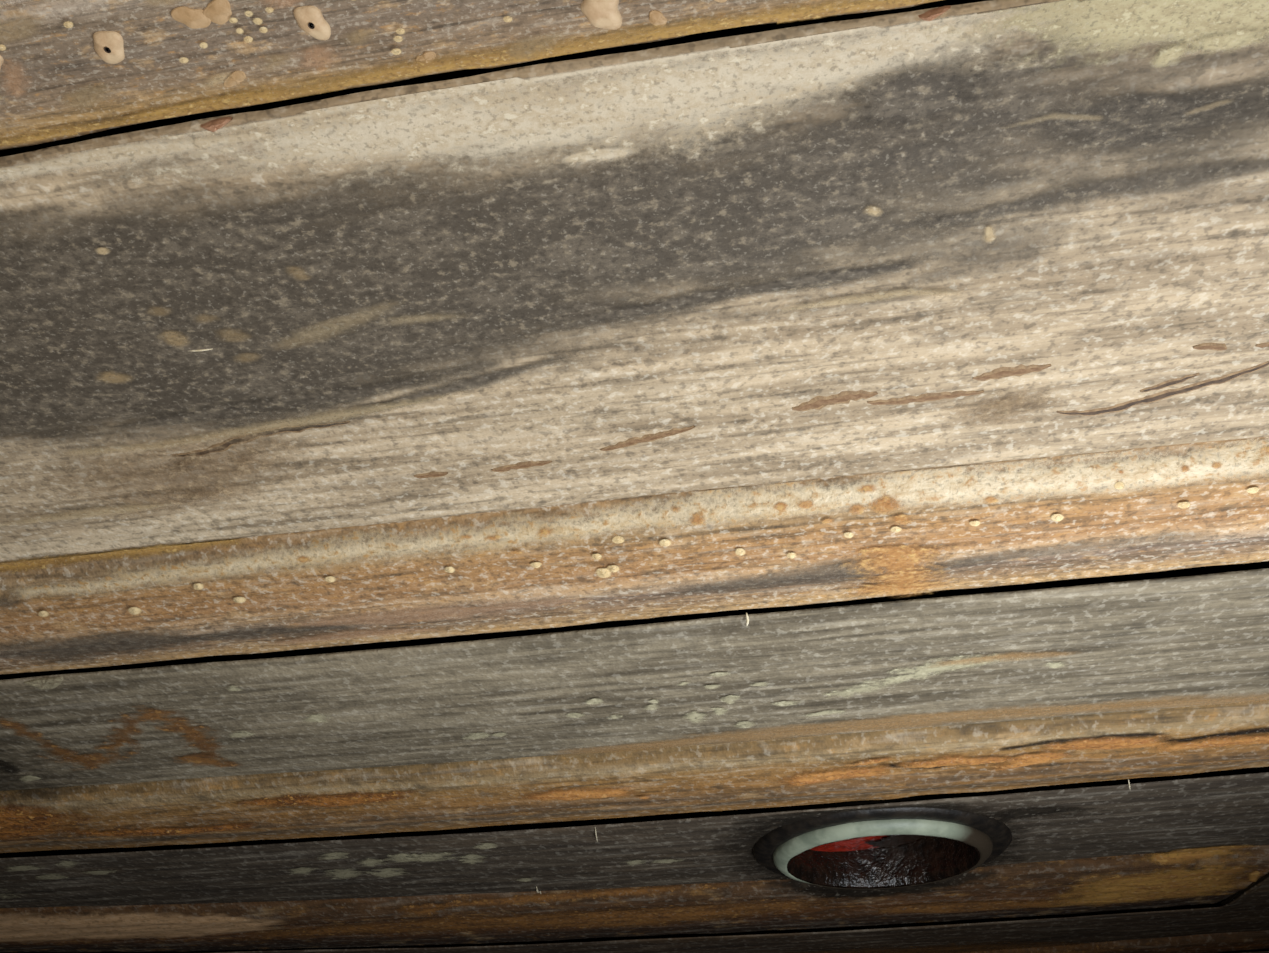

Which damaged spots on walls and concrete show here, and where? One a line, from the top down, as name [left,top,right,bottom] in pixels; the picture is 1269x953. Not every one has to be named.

damp [0,1,1269,440]
crack [1057,342,1269,416]
damp [592,554,619,578]